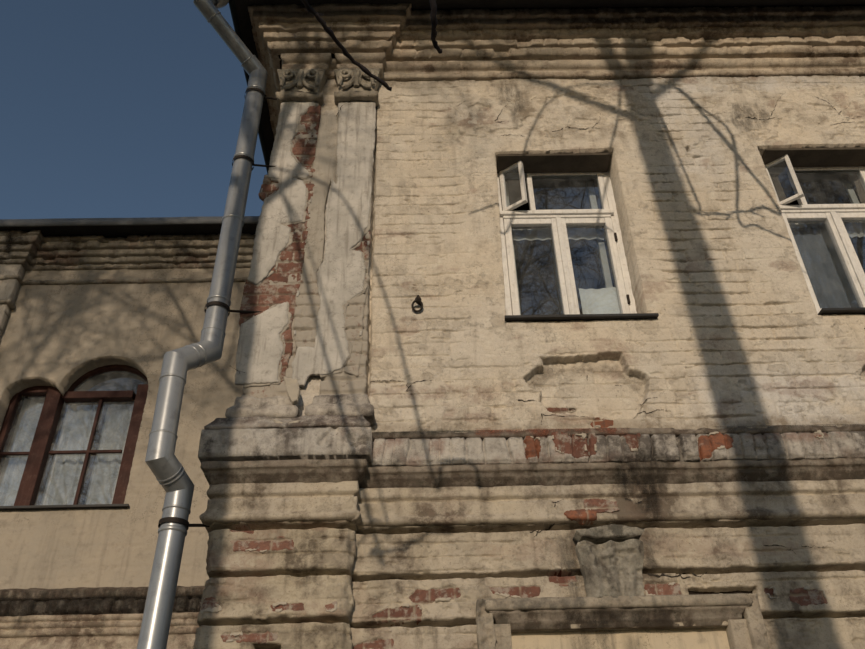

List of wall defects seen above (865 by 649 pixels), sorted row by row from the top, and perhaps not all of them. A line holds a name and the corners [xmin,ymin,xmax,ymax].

flaking render [239,105,321,382]
flaking render [351,231,371,267]
spalling [523,436,541,460]
spalling [551,417,613,458]
spalling [698,432,733,461]
spalling [564,499,620,525]
spalling [372,587,461,626]
spalling [490,586,541,598]
spalling [547,566,578,586]
spalling [644,582,753,595]
spalling [789,586,828,606]
spalling [353,638,394,649]